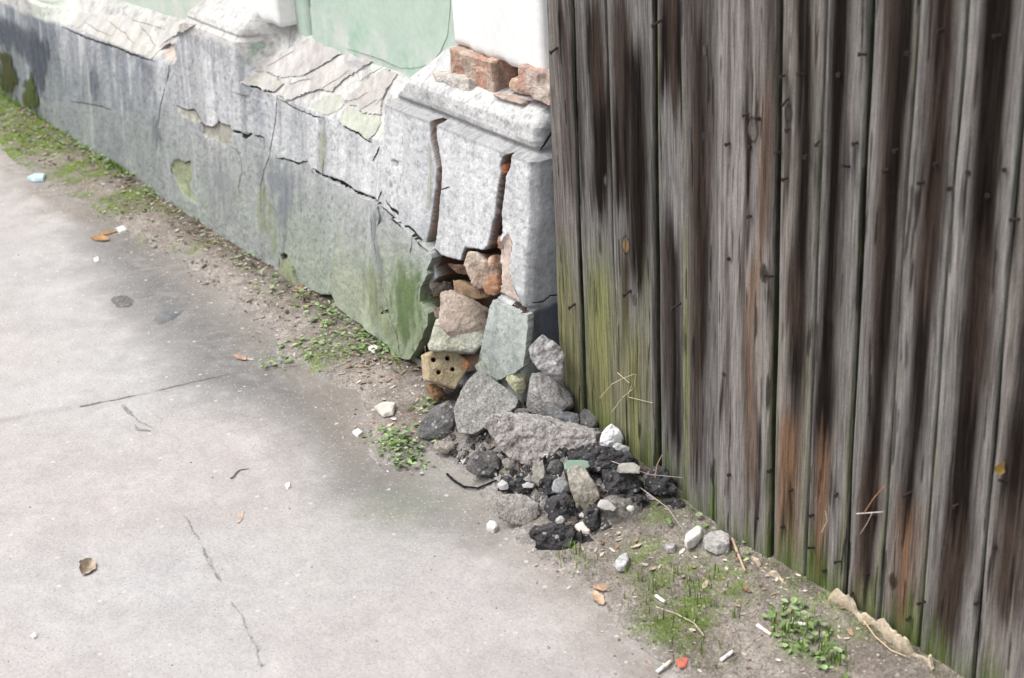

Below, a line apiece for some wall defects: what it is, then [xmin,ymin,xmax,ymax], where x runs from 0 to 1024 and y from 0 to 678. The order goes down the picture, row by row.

water stain [0,19,49,96]
peeling [70,12,196,63]
peeling [240,0,550,141]
spalling [171,160,196,202]
spalling [177,106,233,147]
crack [63,27,437,252]
crack [502,156,512,173]
crack [496,217,504,249]
spalling [429,234,522,319]
crack [183,515,264,666]